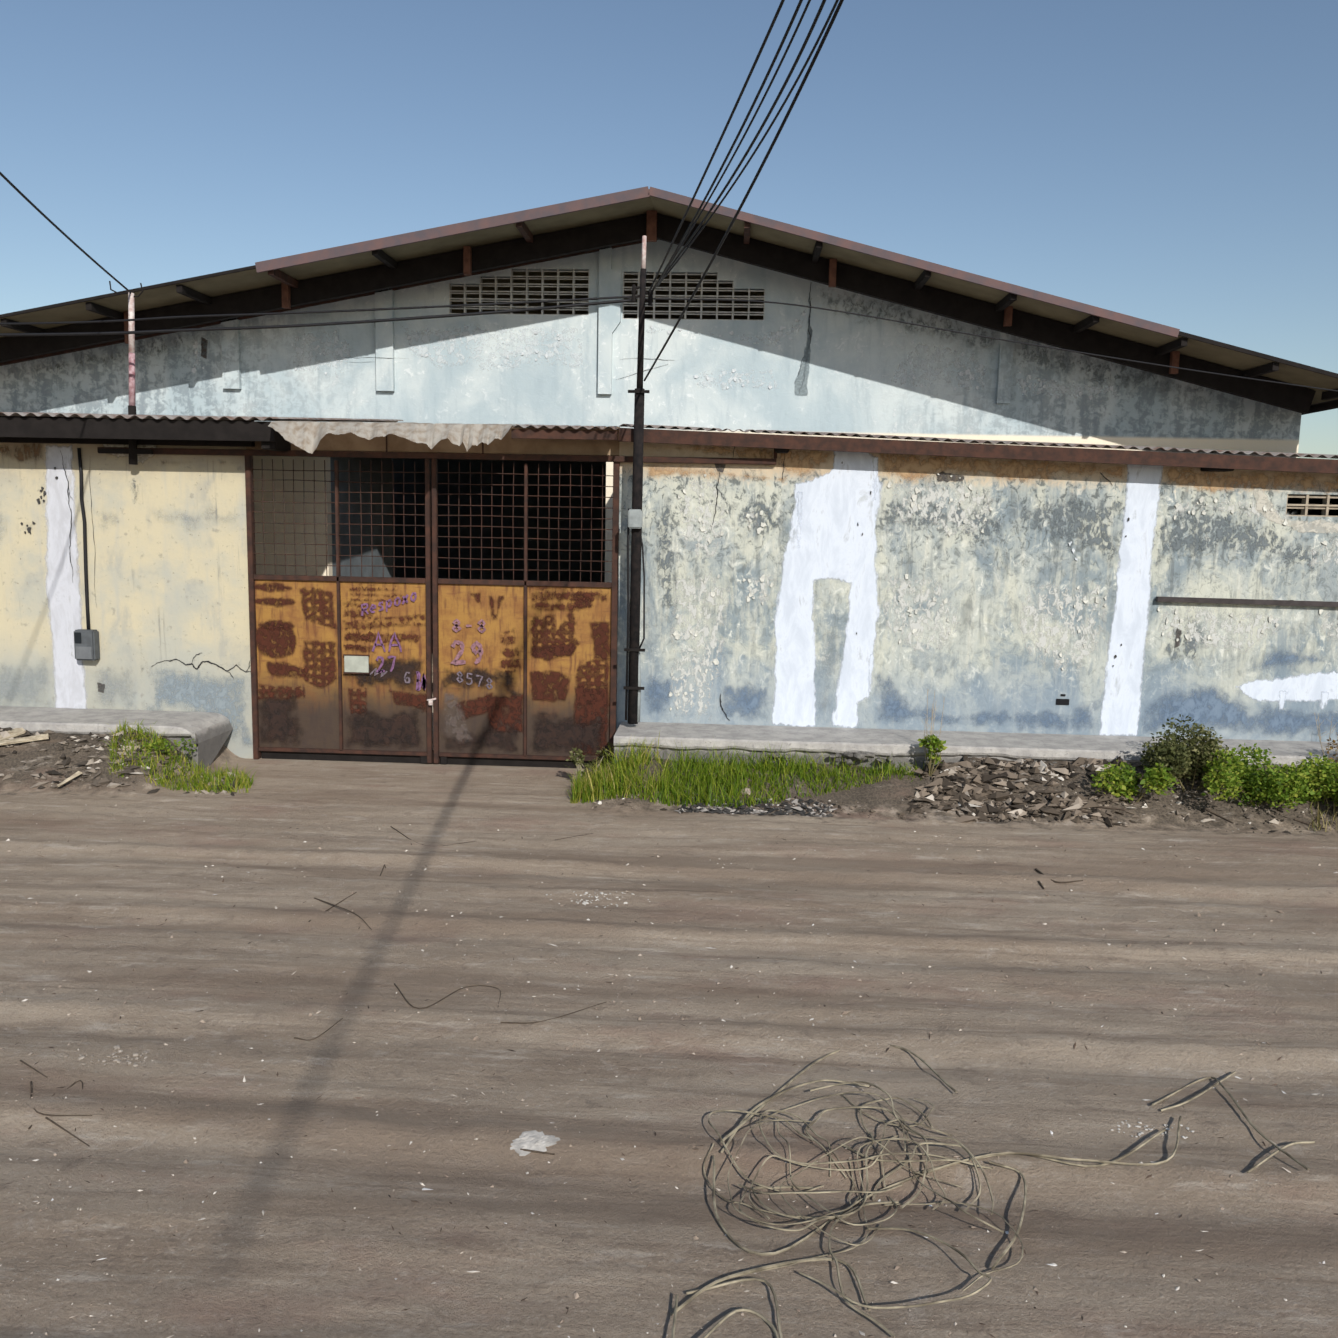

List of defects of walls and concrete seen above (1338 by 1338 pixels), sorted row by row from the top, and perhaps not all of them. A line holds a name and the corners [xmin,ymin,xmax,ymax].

crack [795,284,812,396]
crack [151,653,251,679]
rust [255,583,427,747]
rust [445,586,610,755]
water stain [869,654,959,724]
water stain [977,710,1091,727]
water stain [1166,622,1203,659]
water stain [1148,689,1338,734]
water stain [1265,653,1317,666]